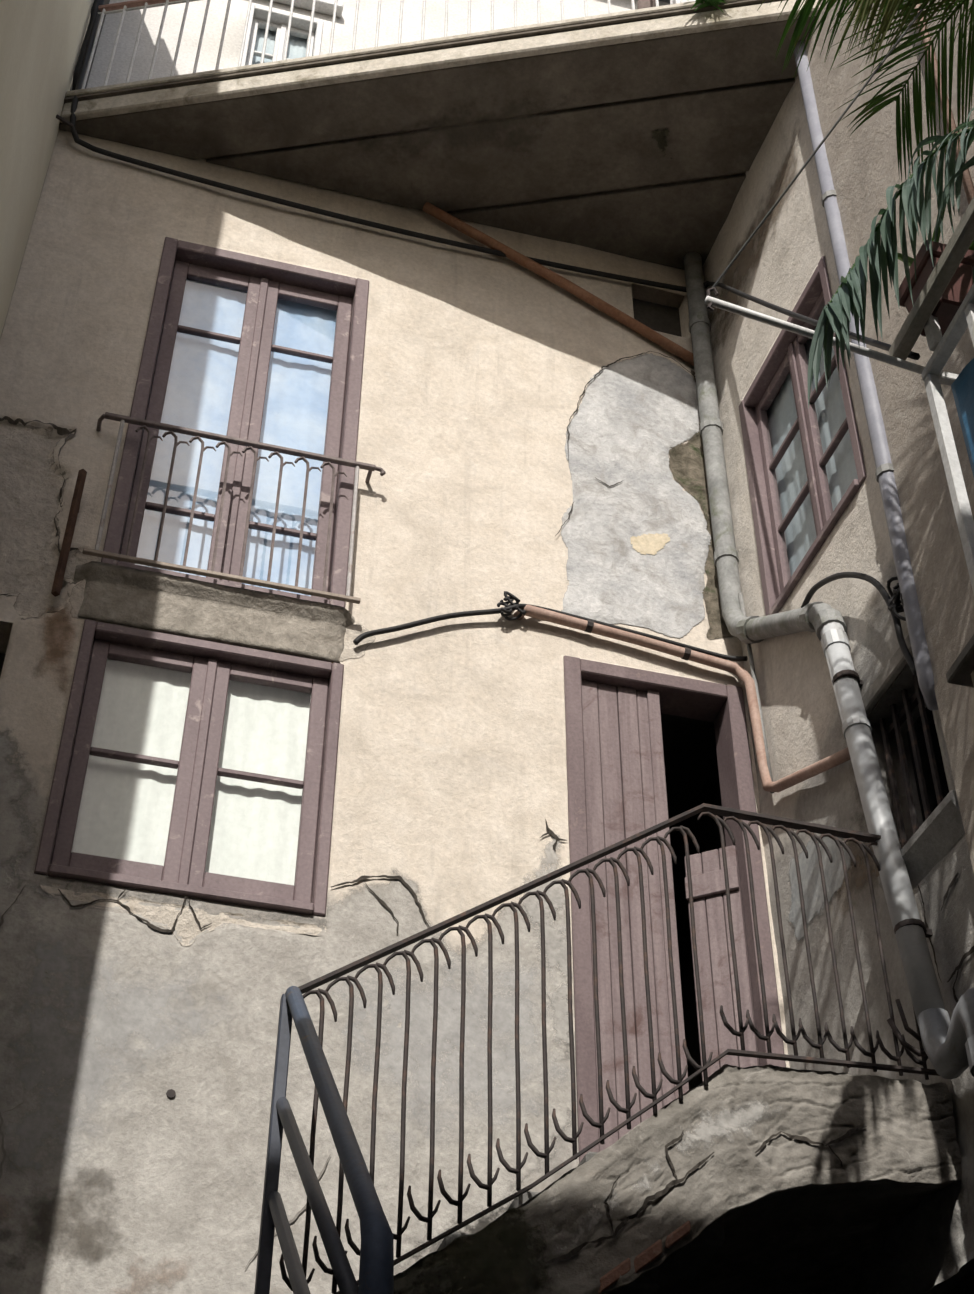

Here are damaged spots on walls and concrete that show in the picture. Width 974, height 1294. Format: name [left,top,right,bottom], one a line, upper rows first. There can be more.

spalling [0,416,92,620]
peeling [630,533,670,555]
spalling [339,624,375,661]
crack [58,888,212,932]
crack [918,873,974,1003]
water stain [7,943,180,1168]
flaking render [0,731,573,1294]
water stain [35,1193,107,1260]